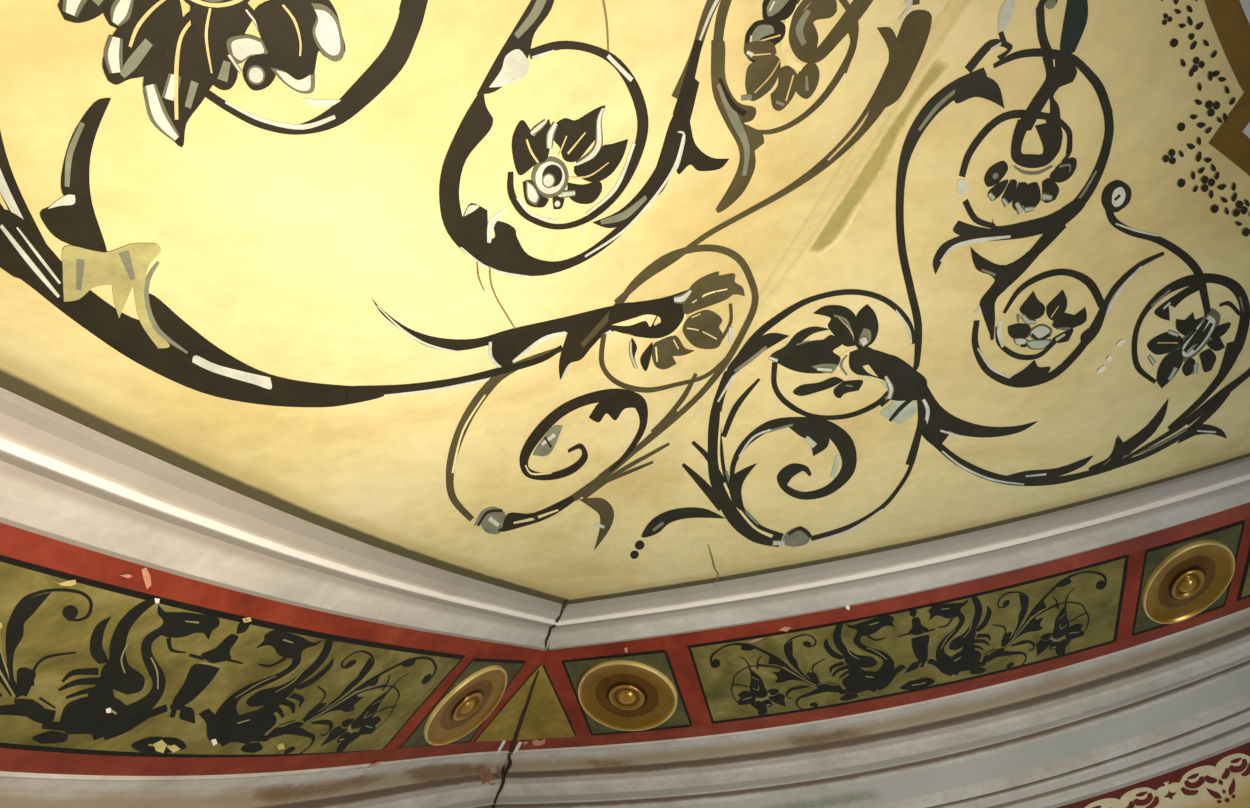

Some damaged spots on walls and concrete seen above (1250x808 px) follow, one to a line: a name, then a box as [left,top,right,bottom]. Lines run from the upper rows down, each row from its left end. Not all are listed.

crack [492,600,569,808]